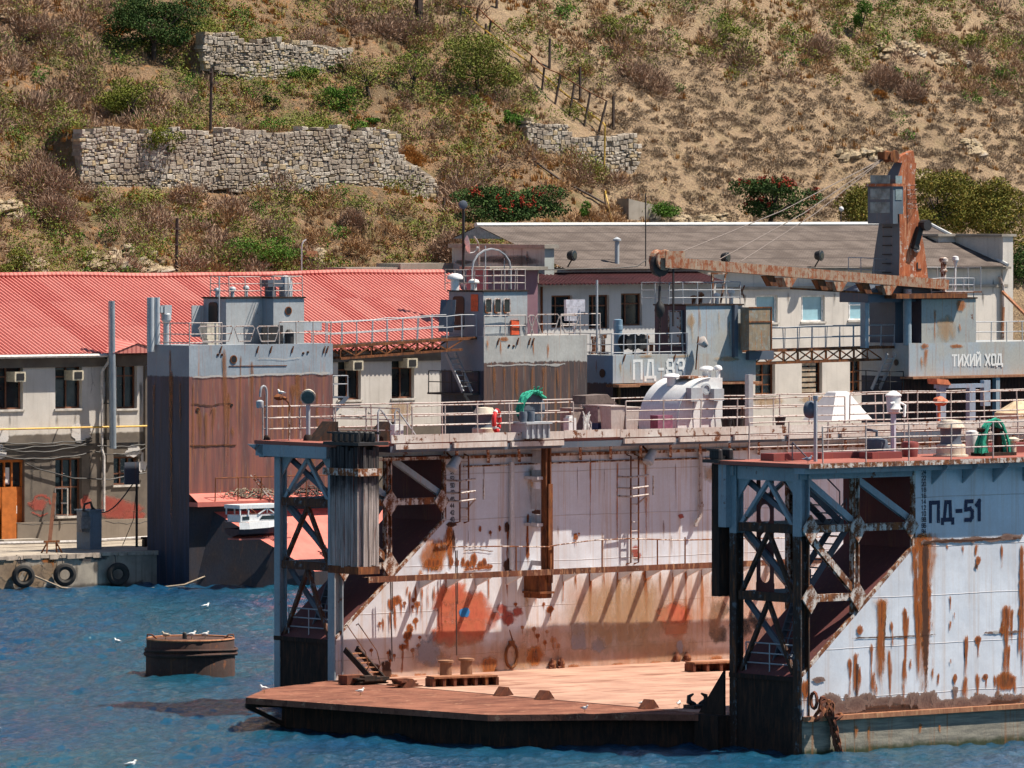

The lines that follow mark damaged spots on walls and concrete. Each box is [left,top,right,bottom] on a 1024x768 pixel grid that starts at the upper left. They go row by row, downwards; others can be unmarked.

corrosion [169,350,318,481]
corrosion [370,522,511,677]
corrosion [521,598,560,666]
corrosion [563,569,713,641]
corrosion [848,533,939,697]
corrosion [950,546,1024,699]